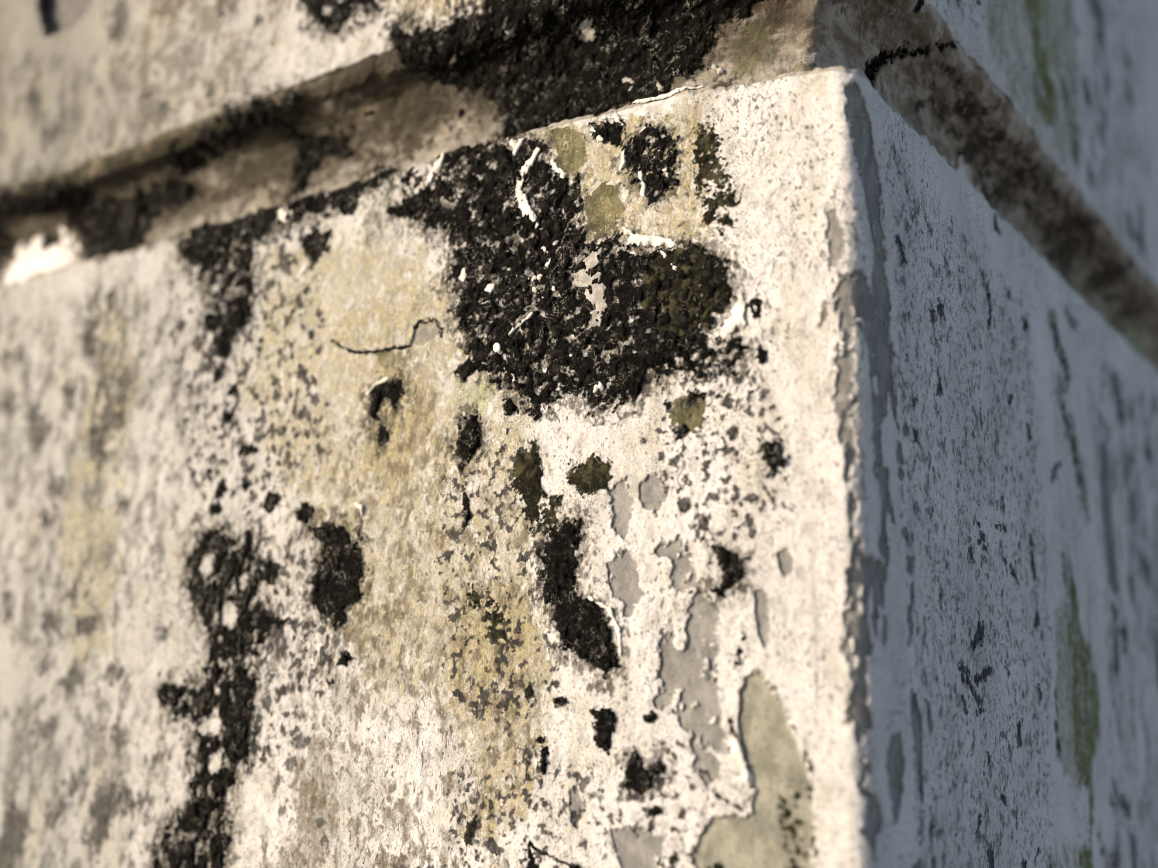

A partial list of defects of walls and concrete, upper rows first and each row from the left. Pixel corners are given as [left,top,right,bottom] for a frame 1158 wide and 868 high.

leakage [930,0,1149,334]
peeling [569,784,583,830]
peeling [606,474,669,617]
peeling [611,534,817,868]
peeling [825,81,933,861]
peeling [911,821,936,868]
leakage [893,146,1158,868]